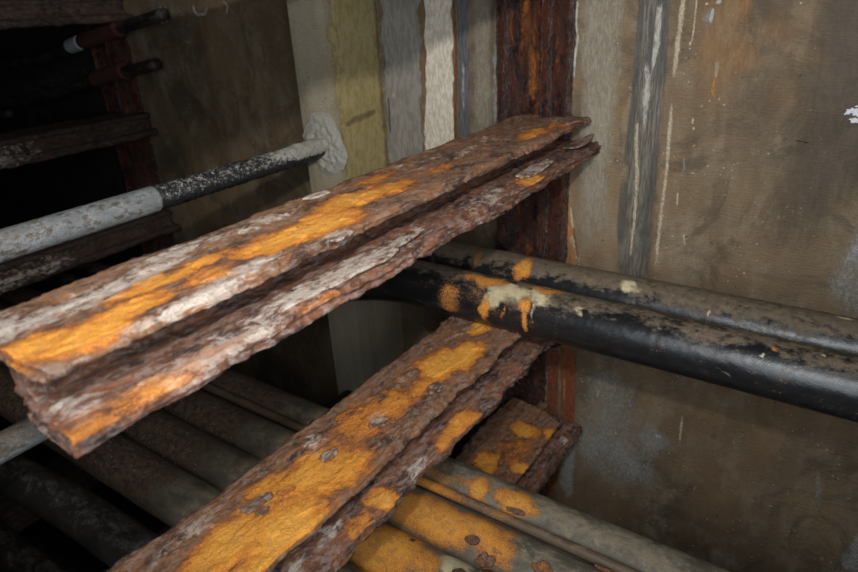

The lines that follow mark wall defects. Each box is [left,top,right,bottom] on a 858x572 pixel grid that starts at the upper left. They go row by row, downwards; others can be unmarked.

leakage [617,0,697,278]
rust [567,194,581,266]
rust [546,347,576,423]